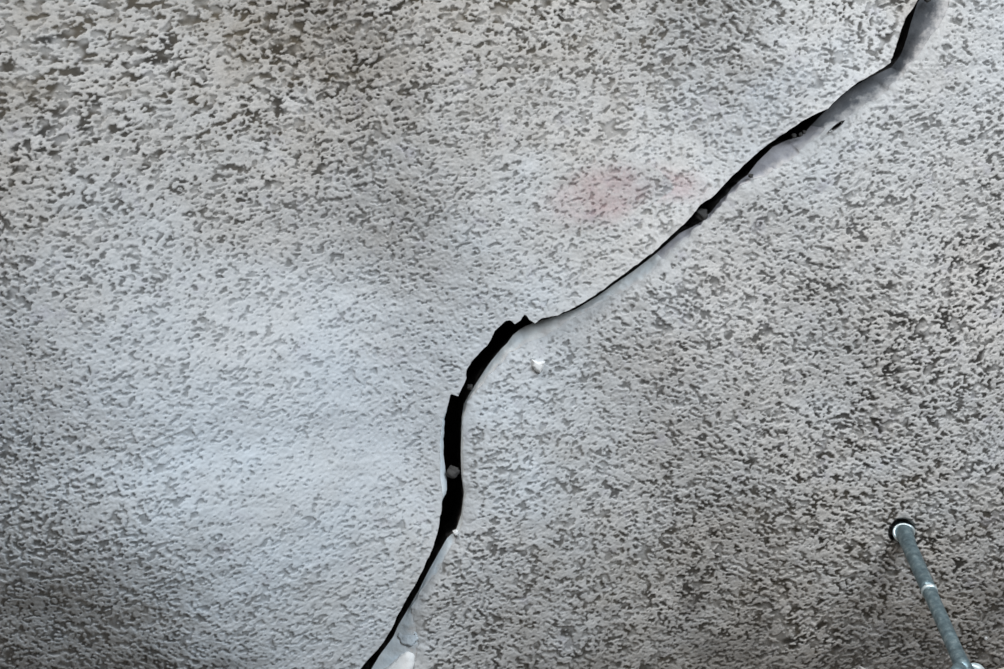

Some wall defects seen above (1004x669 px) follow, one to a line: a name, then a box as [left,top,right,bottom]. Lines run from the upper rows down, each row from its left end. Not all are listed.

crack [361,0,949,669]